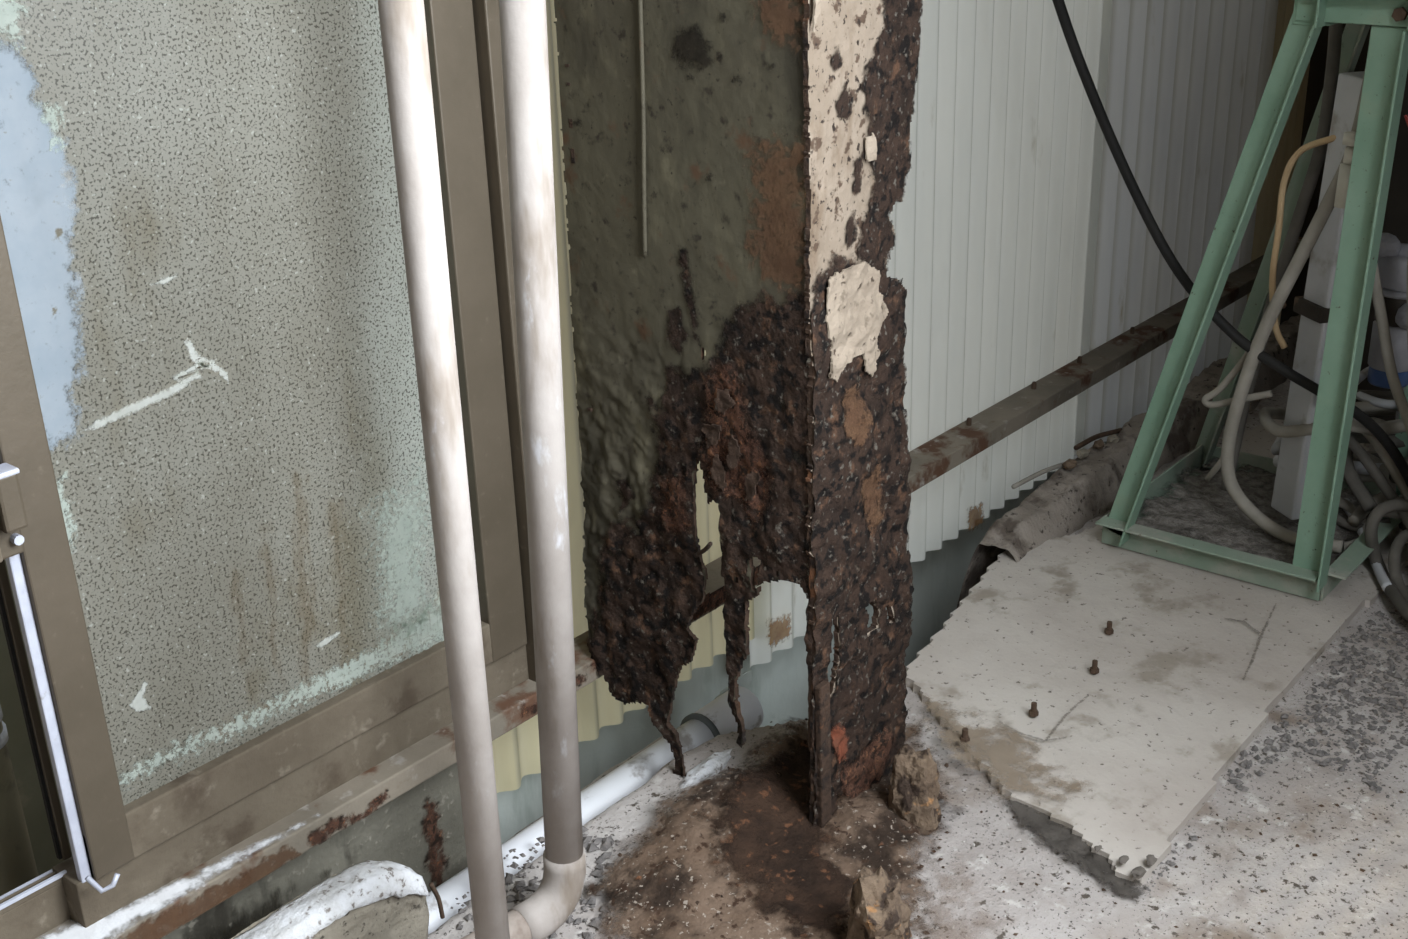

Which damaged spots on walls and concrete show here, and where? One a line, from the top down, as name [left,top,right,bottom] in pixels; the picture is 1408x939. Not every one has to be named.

peeling [812,0,821,32]
peeling [864,132,877,162]
peeling [825,261,889,382]
corrosion [576,0,923,938]
crack [1227,607,1275,680]
corrosion [118,789,389,939]
corrosion [421,797,449,887]